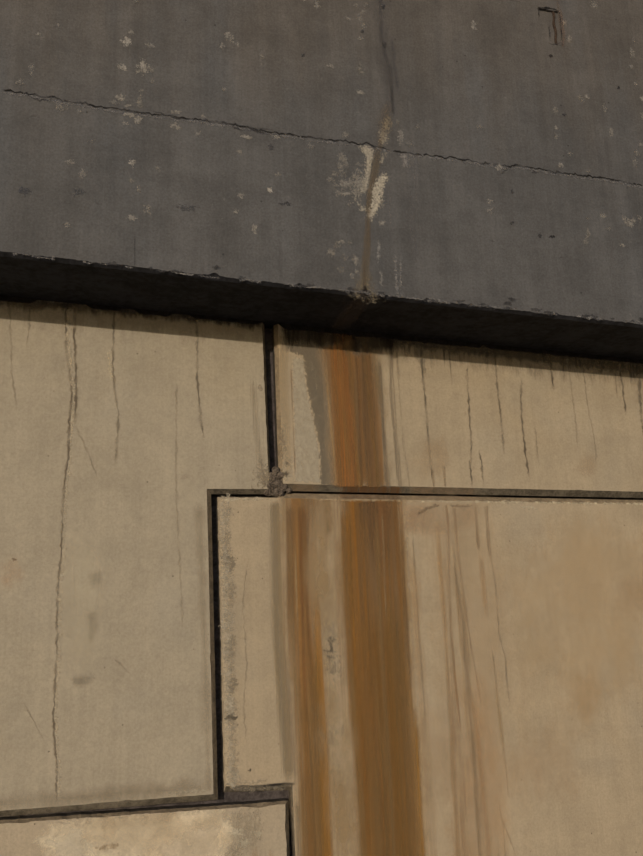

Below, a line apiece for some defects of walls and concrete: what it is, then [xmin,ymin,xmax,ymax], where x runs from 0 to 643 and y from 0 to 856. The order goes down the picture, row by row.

crack [2,89,643,189]
rust [366,152,380,213]
crack [63,307,77,497]
water stain [293,358,319,483]
rust [281,236,425,856]
peeling [306,498,643,509]
crack [52,523,64,794]
spalling [219,431,294,793]
water stain [35,809,262,856]